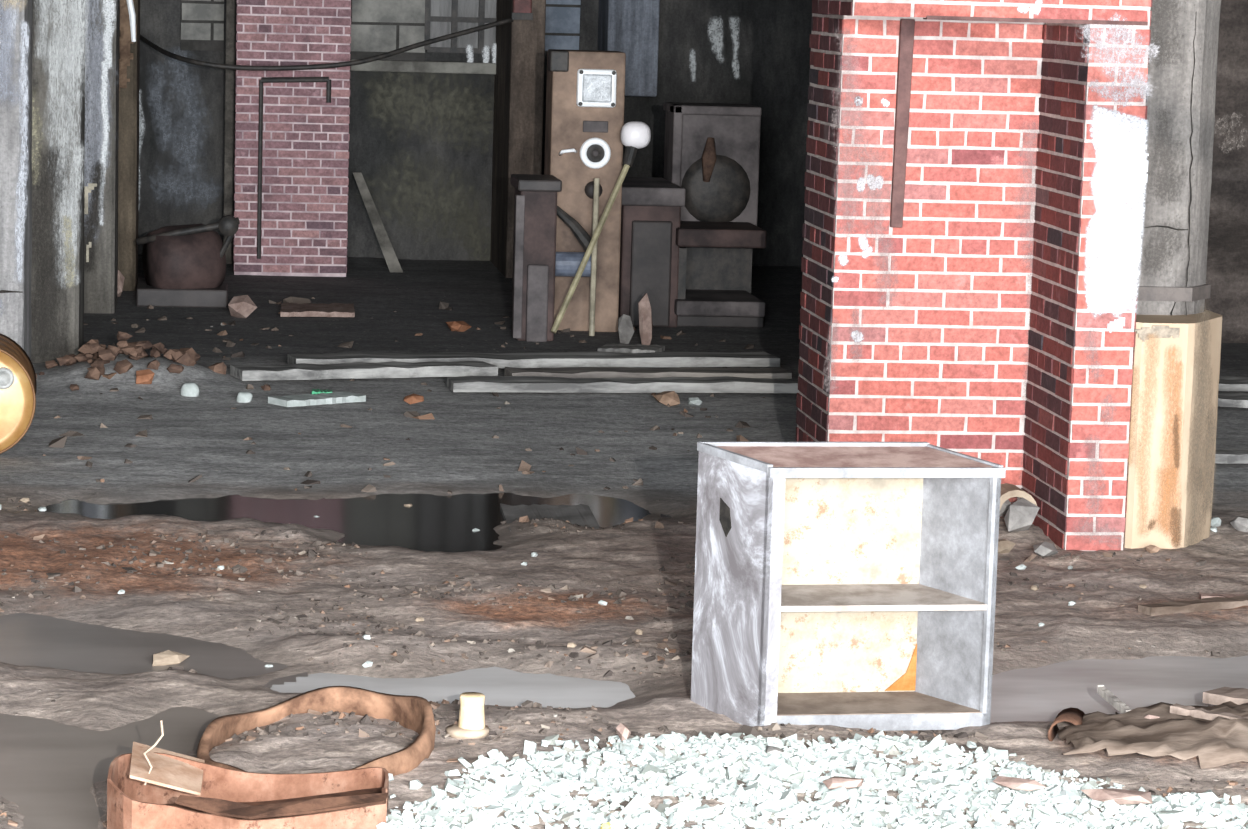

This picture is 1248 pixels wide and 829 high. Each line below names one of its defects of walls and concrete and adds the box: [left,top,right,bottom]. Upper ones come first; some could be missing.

leakage [0,0,116,360]
leakage [139,49,218,205]
leakage [368,73,491,140]
leakage [466,43,496,63]